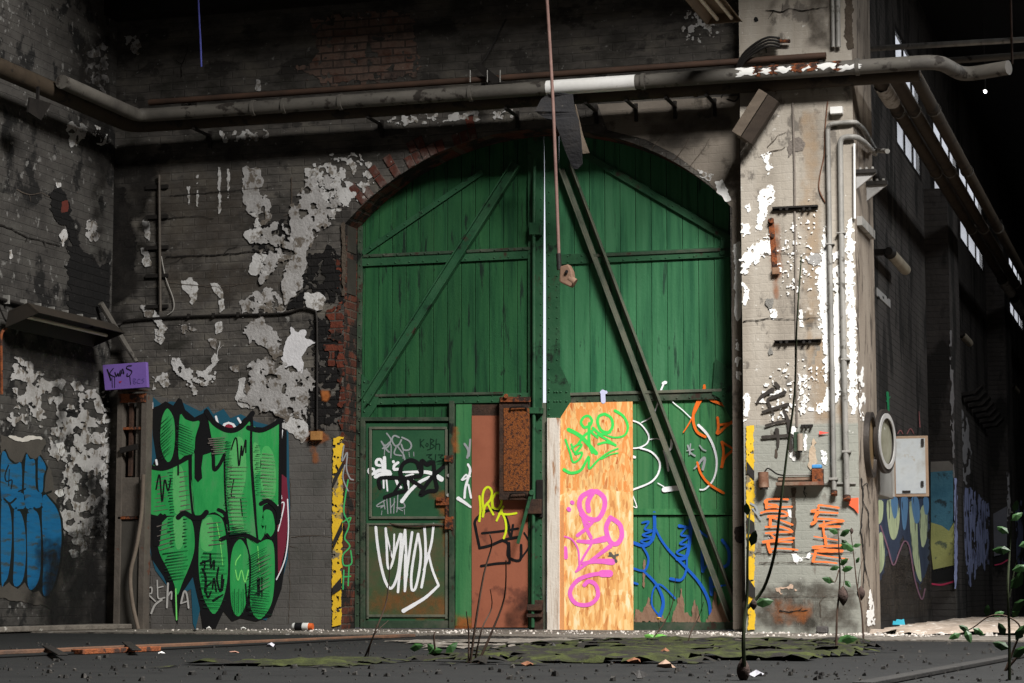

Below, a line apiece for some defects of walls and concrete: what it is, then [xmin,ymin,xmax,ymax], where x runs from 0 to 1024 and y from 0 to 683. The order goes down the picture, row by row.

corrosion [752,60,842,77]
peeling [140,277,225,395]
peeling [230,109,513,443]
peeling [733,151,866,470]
peeling [6,357,110,554]